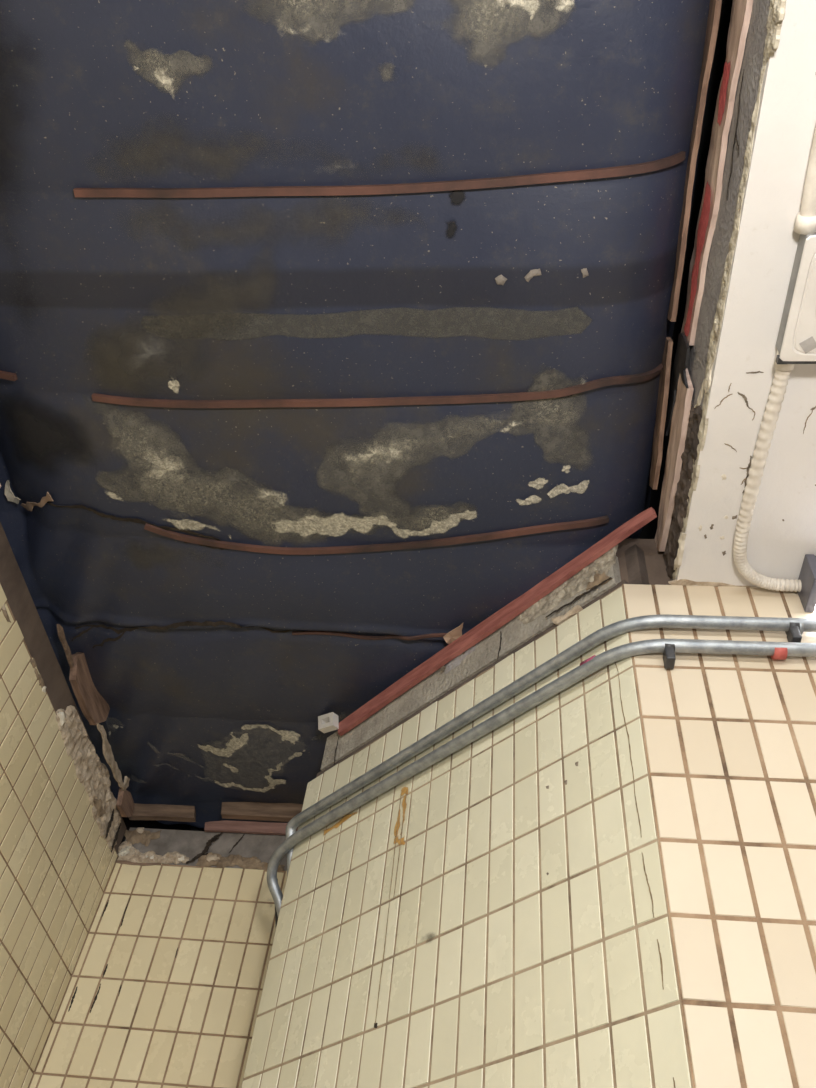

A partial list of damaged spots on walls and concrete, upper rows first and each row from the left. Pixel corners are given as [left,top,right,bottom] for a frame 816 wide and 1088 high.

water stain [252,0,412,40]
water stain [453,0,574,63]
water stain [127,42,211,91]
crack [727,70,744,200]
peeling [524,269,542,282]
flaking render [663,0,786,587]
crack [715,371,764,420]
water stain [96,370,589,545]
crack [724,443,752,493]
flaking render [56,705,285,871]
corrosion [394,787,408,845]
crack [186,832,245,864]